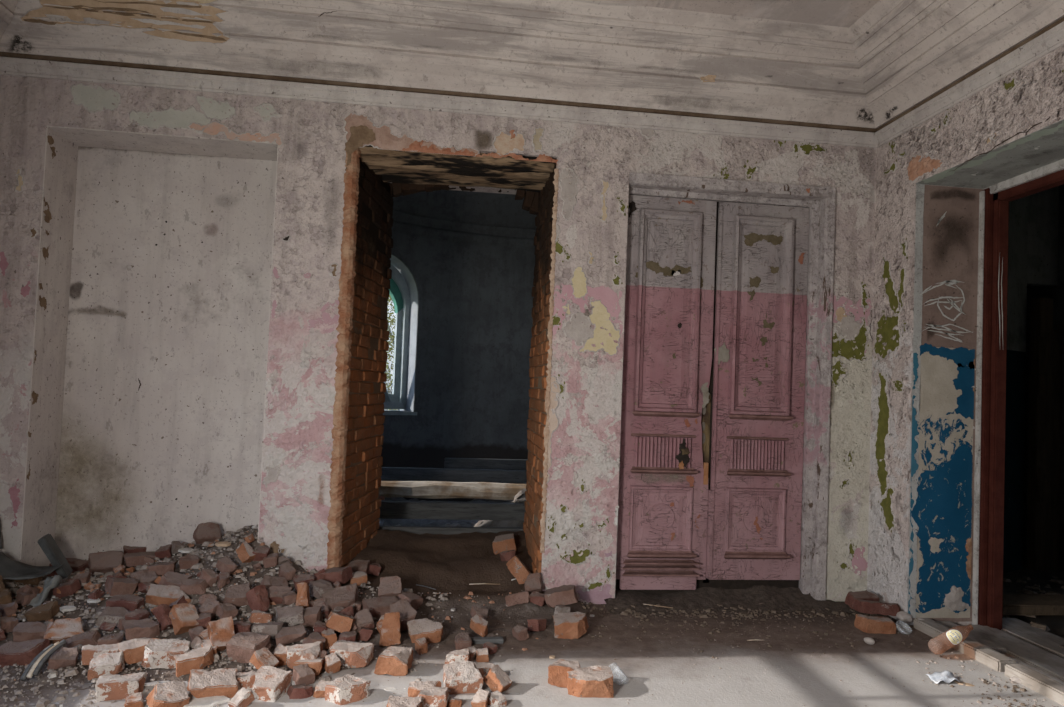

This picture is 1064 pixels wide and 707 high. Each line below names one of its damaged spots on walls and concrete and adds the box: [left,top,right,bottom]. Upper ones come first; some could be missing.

peeling [20,0,231,44]
flaking render [308,112,637,617]
peeling [831,238,976,618]